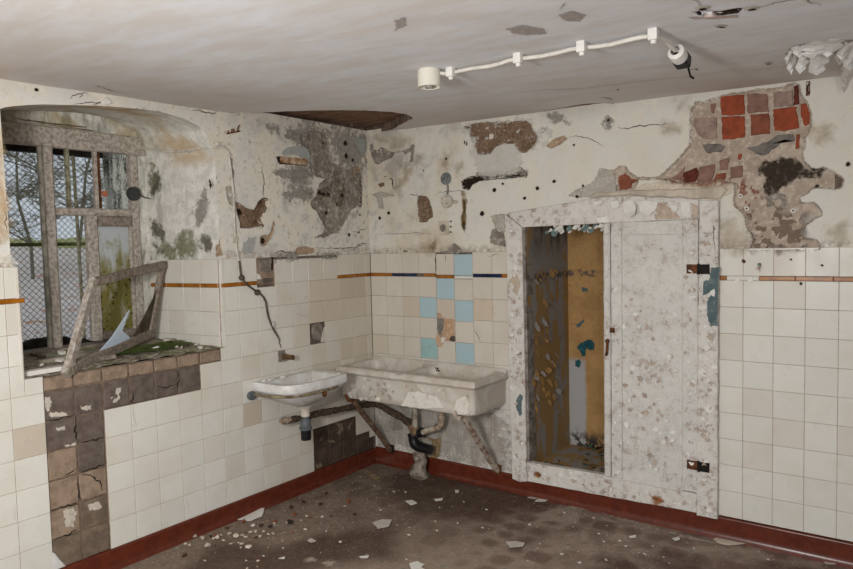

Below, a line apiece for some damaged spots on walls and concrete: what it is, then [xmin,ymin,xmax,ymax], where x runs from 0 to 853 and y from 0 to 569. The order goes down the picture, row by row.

flaking render [226,159,275,246]
flaking render [298,114,414,238]
flaking render [417,195,433,222]
flaking render [457,119,575,192]
flaking render [545,38,853,252]
peeling [256,257,274,284]
peeling [313,416,374,471]